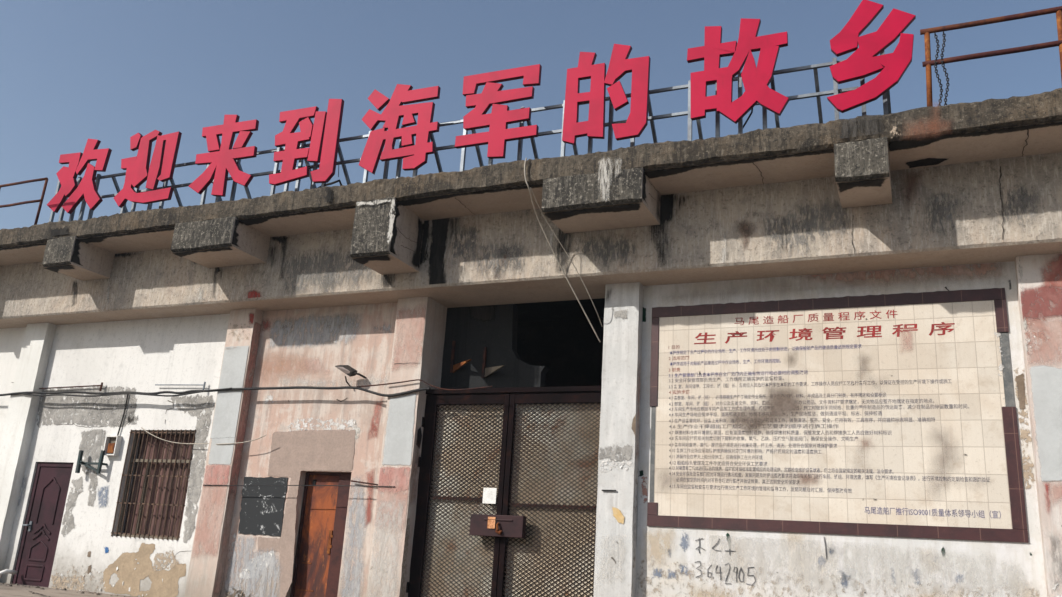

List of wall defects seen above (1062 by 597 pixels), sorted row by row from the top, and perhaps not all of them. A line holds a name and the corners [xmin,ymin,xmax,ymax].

water stain [173,187,356,264]
water stain [270,184,543,293]
crack [999,129,1029,240]
peeling [37,386,138,536]
peeling [51,394,215,597]